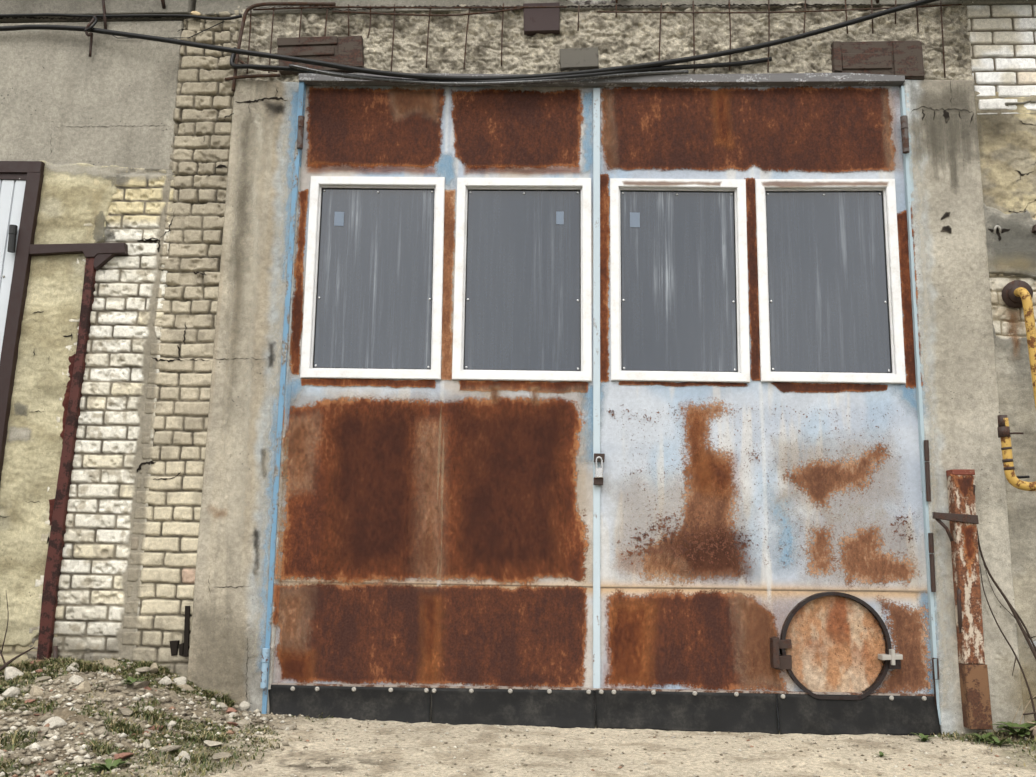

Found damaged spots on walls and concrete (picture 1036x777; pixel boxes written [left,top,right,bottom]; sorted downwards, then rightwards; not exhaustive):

spalling [225,0,1036,220]
corrosion [272,86,896,691]
corrosion [897,208,923,388]
peeling [941,212,952,234]
spalling [989,274,1036,339]
corrosion [805,522,933,693]
corrosion [950,474,974,503]
corrosion [961,523,977,581]